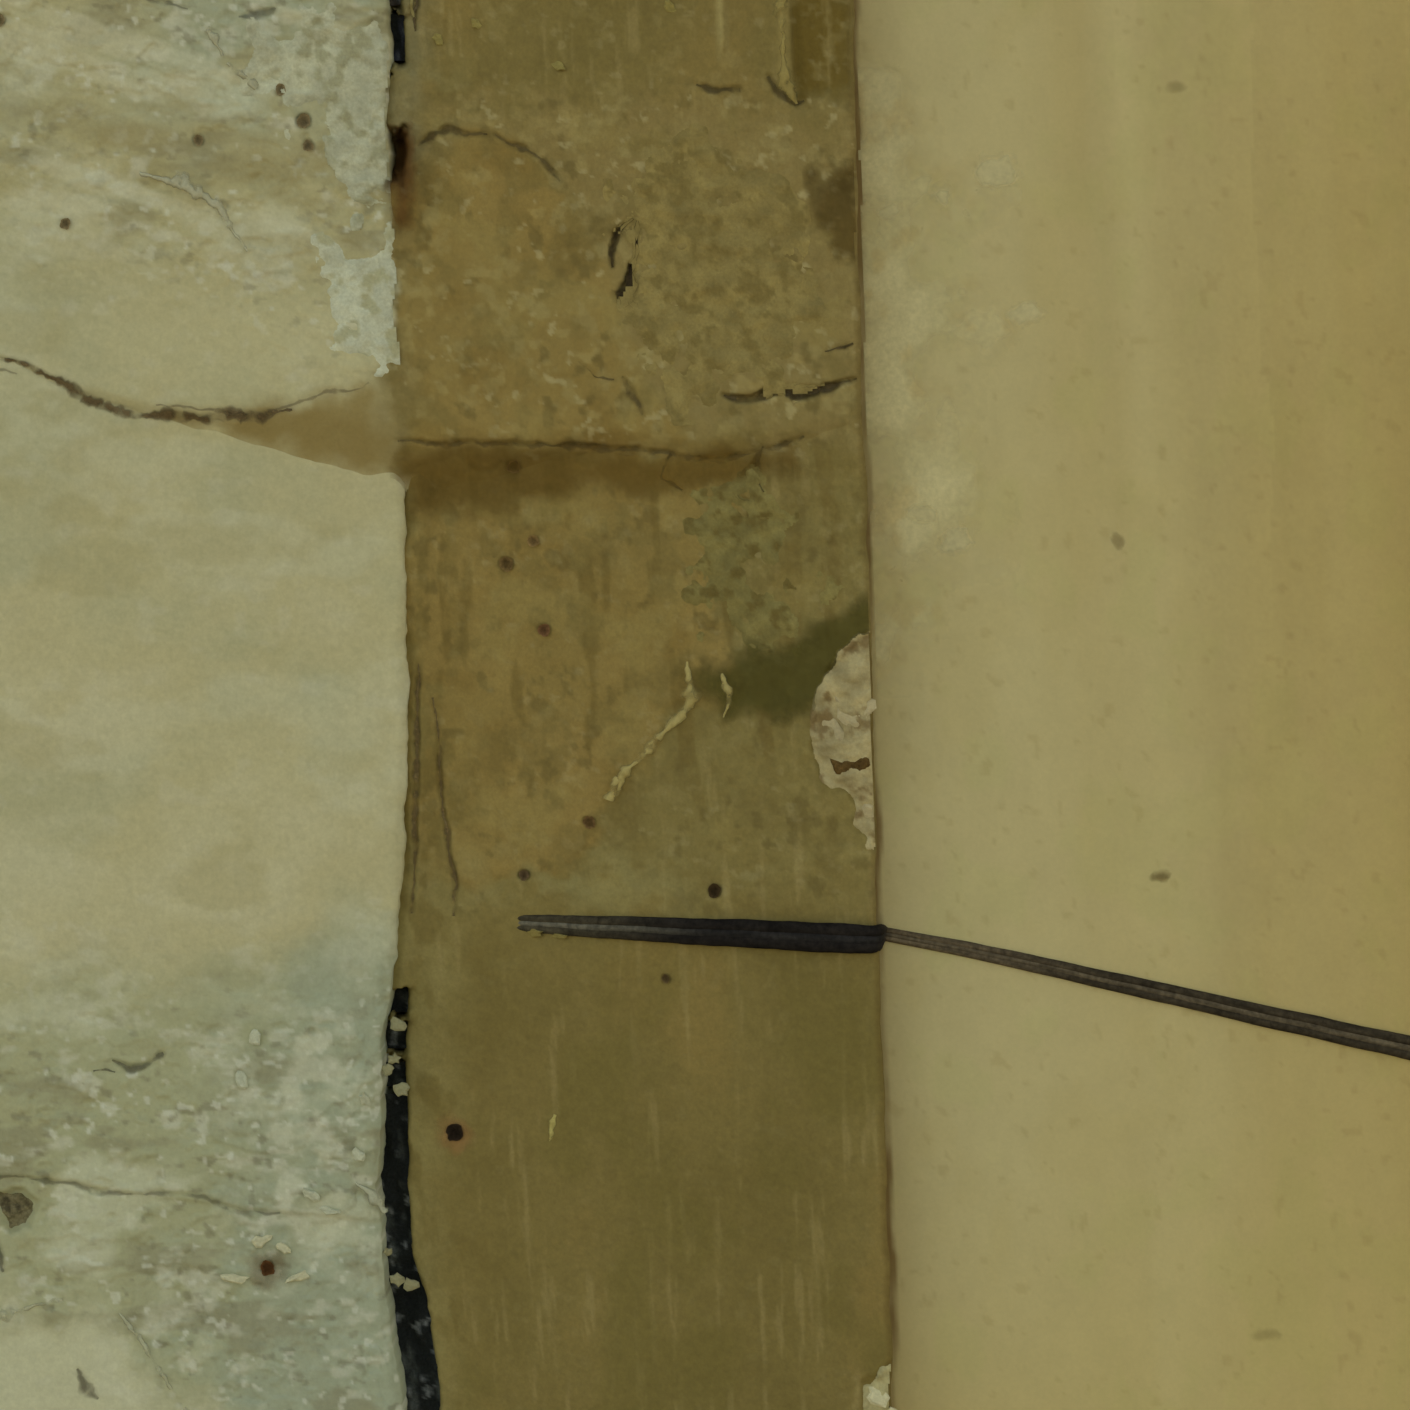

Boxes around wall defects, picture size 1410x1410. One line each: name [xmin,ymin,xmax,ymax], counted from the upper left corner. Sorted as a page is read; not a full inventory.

crack [422,126,553,171]
crack [609,219,639,297]
peeling [858,72,947,433]
crack [4,358,292,423]
crack [724,343,857,400]
peeling [882,436,972,554]
spalling [810,626,892,850]
crack [381,987,440,1410]
spalling [863,1364,897,1410]